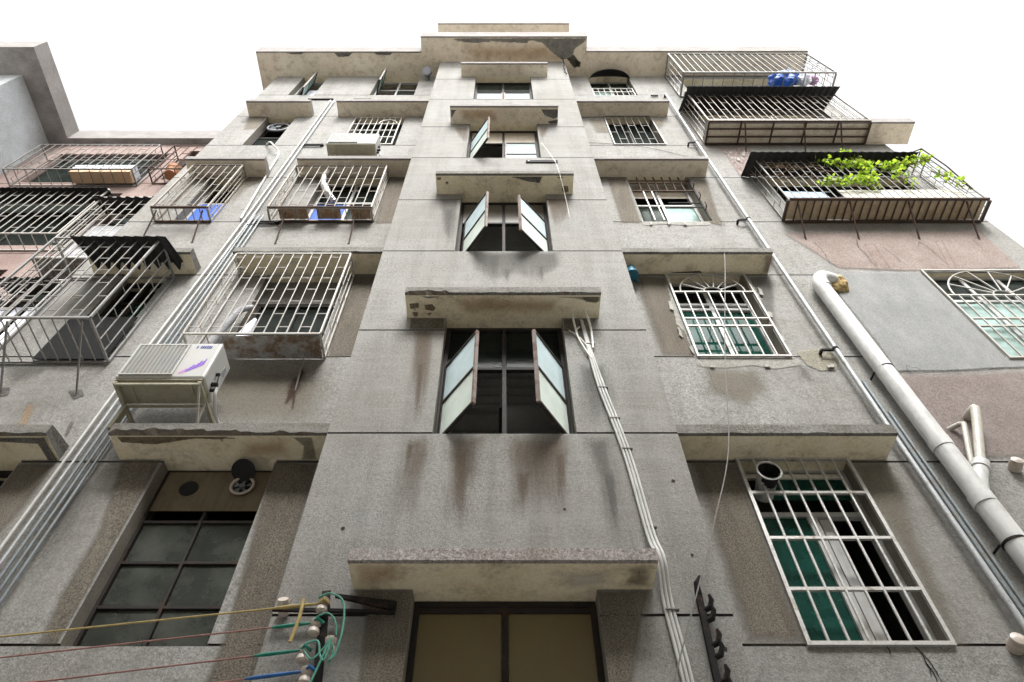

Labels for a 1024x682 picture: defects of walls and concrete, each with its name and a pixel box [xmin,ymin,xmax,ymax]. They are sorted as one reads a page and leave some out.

peeling [454,38,586,59]
peeling [409,303,435,317]
rust [286,370,303,409]